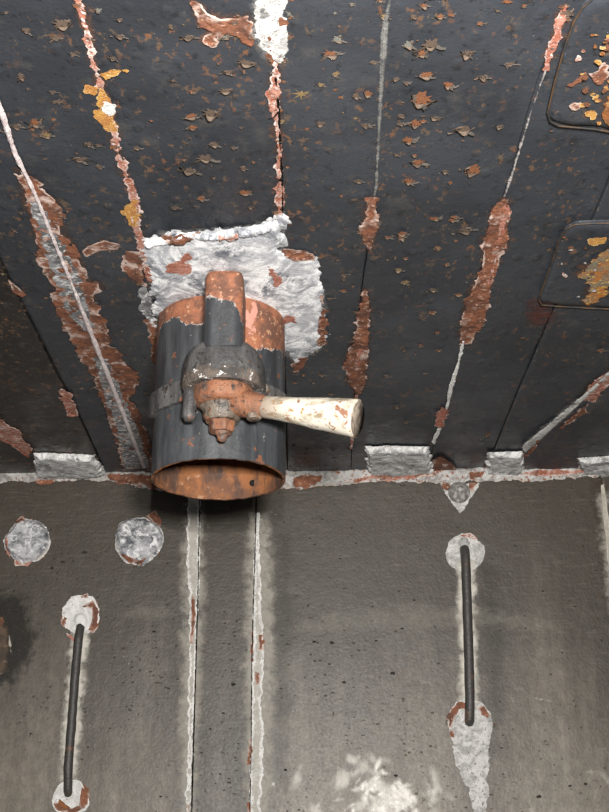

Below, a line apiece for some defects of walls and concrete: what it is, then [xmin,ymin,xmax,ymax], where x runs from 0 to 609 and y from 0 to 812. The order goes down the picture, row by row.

corrosion [189,1,255,48]
peeling [542,4,574,71]
corrosion [567,34,609,126]
corrosion [13,0,157,491]
corrosion [358,197,382,250]
corrosion [459,197,512,345]
corrosion [561,237,609,307]
peeling [137,286,157,365]
corrosion [342,289,373,395]
corrosion [344,456,456,483]
leakage [244,519,274,812]
leakage [452,743,490,812]